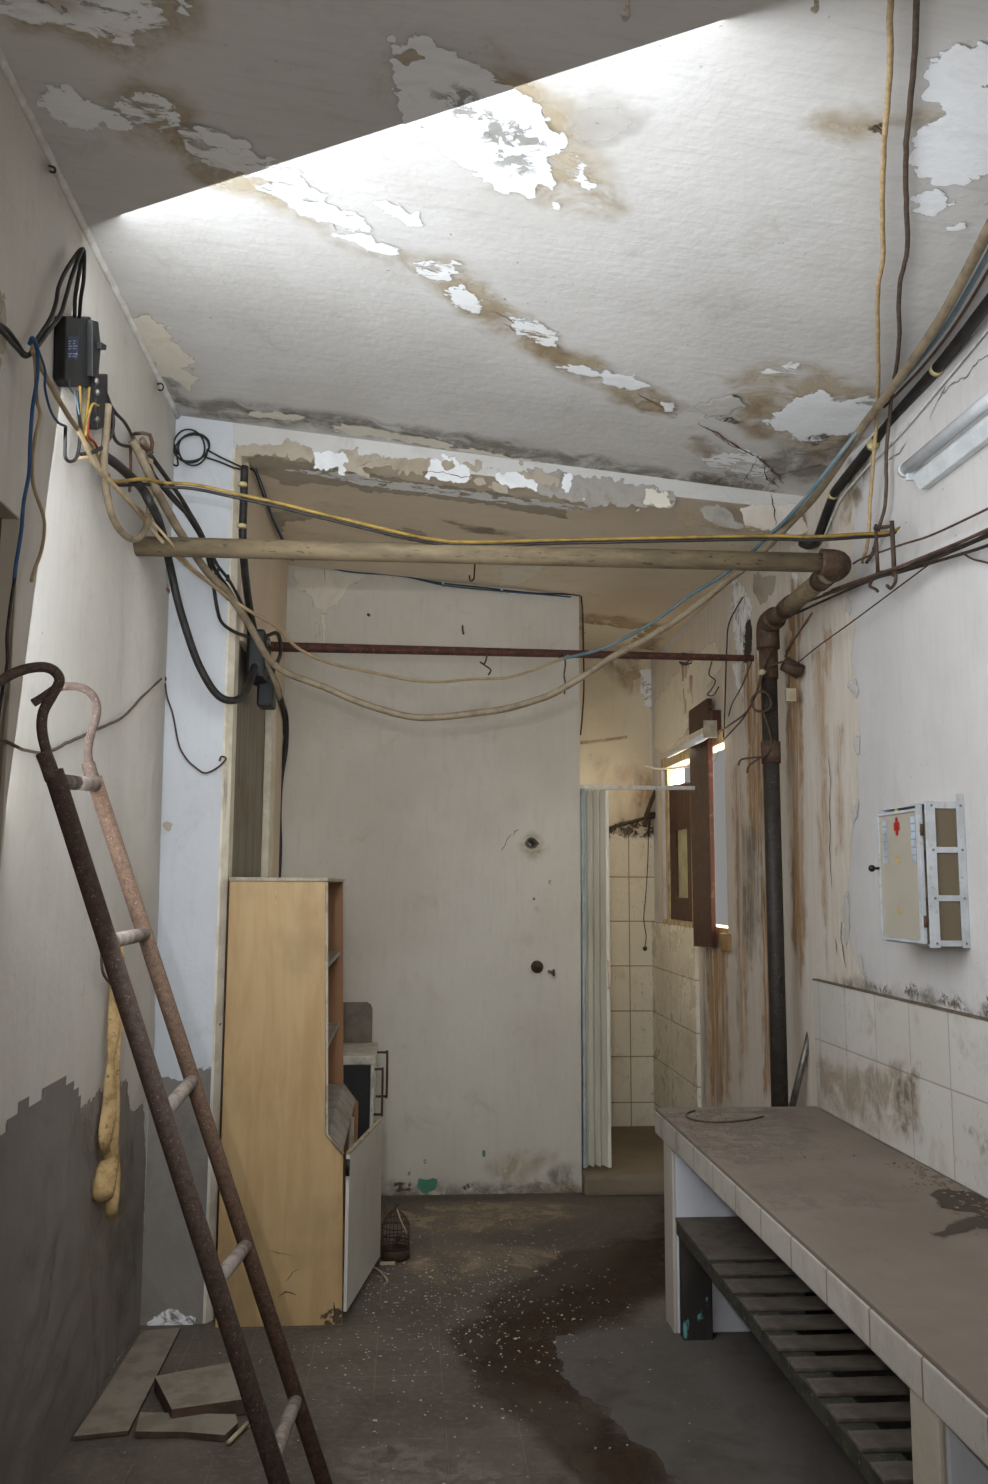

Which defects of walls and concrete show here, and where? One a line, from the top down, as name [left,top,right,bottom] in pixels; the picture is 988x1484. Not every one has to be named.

peeling [0,0,194,49]
peeling [36,83,423,257]
peeling [386,33,597,210]
peeling [909,41,988,231]
water stain [409,260,590,370]
water stain [176,401,577,466]
peeling [235,438,676,519]
peeling [762,390,876,446]
rust [787,613,805,963]
water stain [905,985,965,1010]
water stain [931,1189,988,1236]
water stain [451,1237,665,1484]